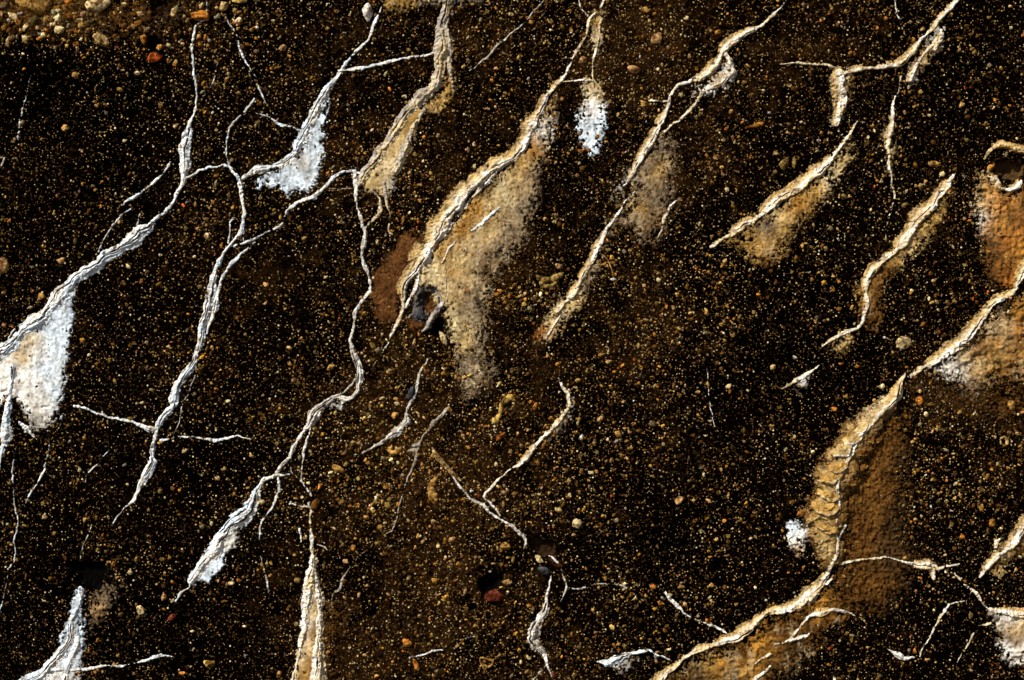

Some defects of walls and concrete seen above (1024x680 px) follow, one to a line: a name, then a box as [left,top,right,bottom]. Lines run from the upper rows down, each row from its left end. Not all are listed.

water stain [0,293,75,431]
water stain [45,581,127,680]
water stain [191,513,242,585]
water stain [255,98,330,199]
crack [0,0,605,680]
water stain [413,95,560,407]
water stain [574,8,608,157]
crack [545,2,785,339]
crack [452,257,1024,680]
water stain [665,397,918,680]
crack [710,0,960,389]